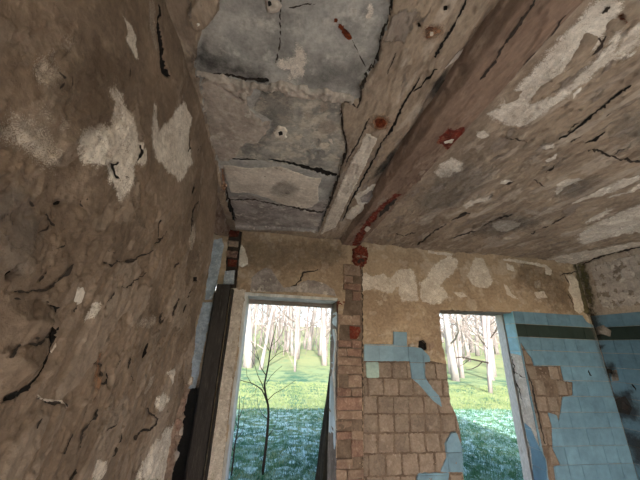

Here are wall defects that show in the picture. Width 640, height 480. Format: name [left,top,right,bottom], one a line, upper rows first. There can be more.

spalling [511,344,572,480]